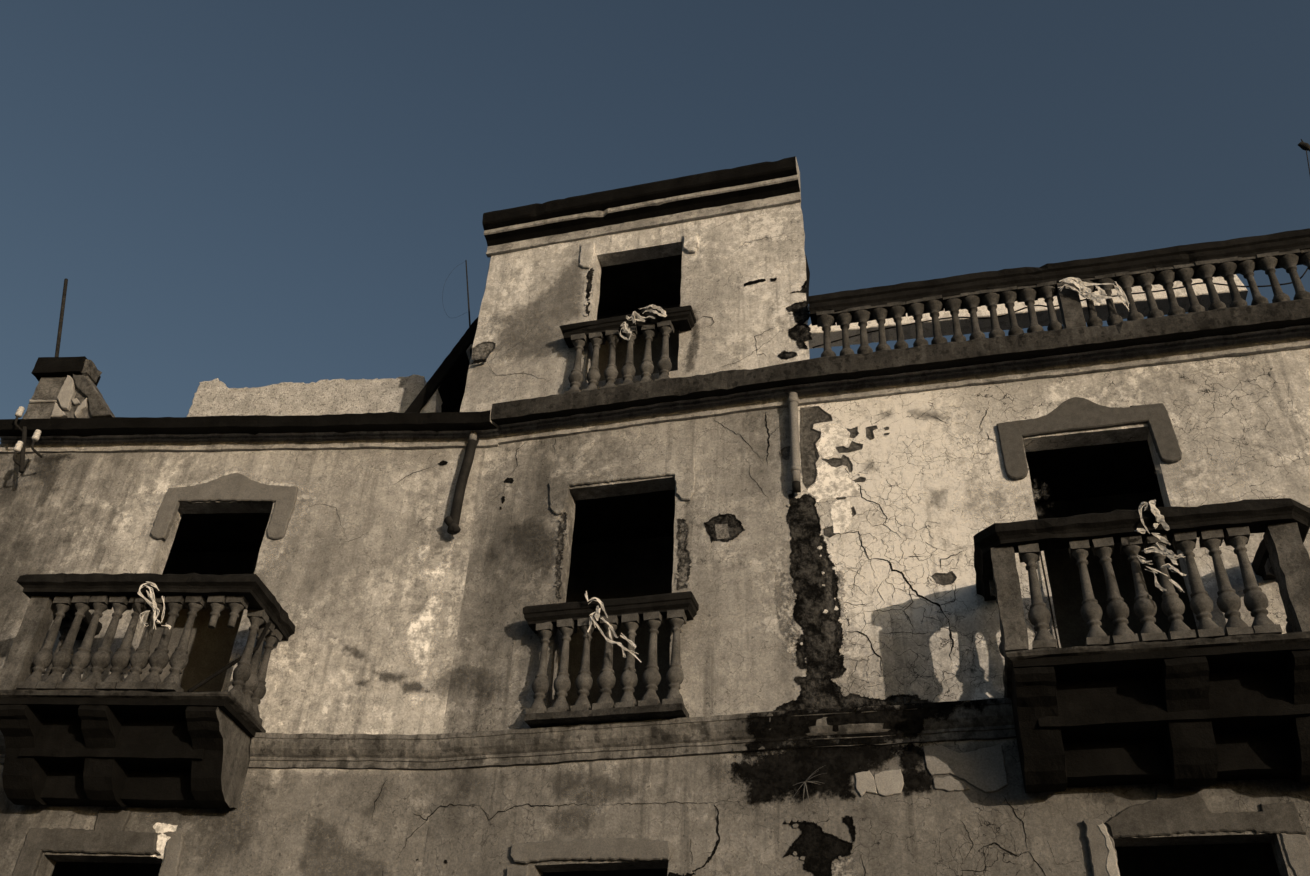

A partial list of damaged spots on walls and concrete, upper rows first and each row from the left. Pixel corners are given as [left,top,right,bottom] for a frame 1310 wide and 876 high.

crack [1203,380,1305,467]
flaking render [676,513,745,590]
flaking render [773,406,930,711]
crack [830,406,996,687]
flaking render [855,769,904,797]
crack [382,796,744,876]
flaking render [783,816,856,876]
crack [939,798,1080,876]